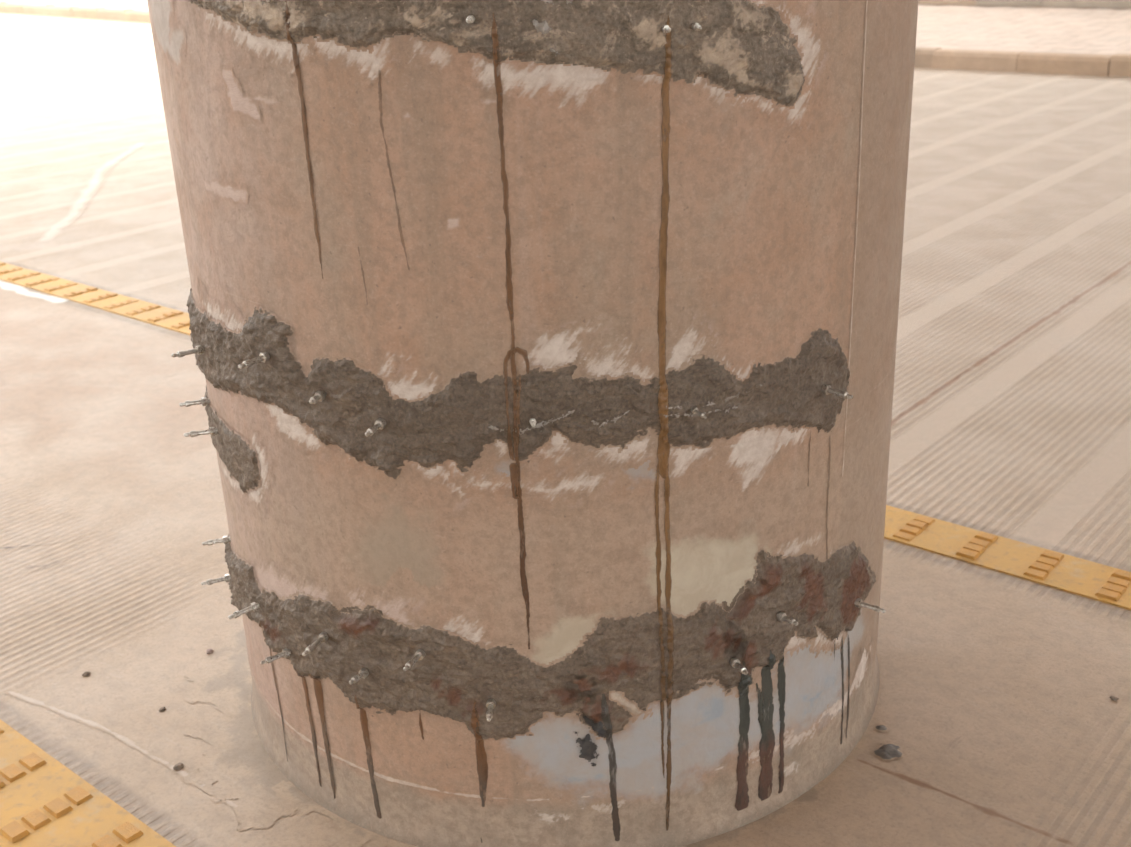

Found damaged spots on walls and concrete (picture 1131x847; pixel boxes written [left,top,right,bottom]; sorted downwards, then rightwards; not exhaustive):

peeling [219,64,282,123]
flaking render [225,0,321,42]
corrosion [285,0,323,279]
flaking render [365,0,465,44]
flaking render [499,36,616,72]
flaking render [621,0,805,106]
corrosion [491,13,530,649]
corrosion [655,16,674,831]
corrosion [295,670,335,798]
corrosion [354,695,382,819]
corrosion [471,702,488,807]
spalling [609,690,646,716]